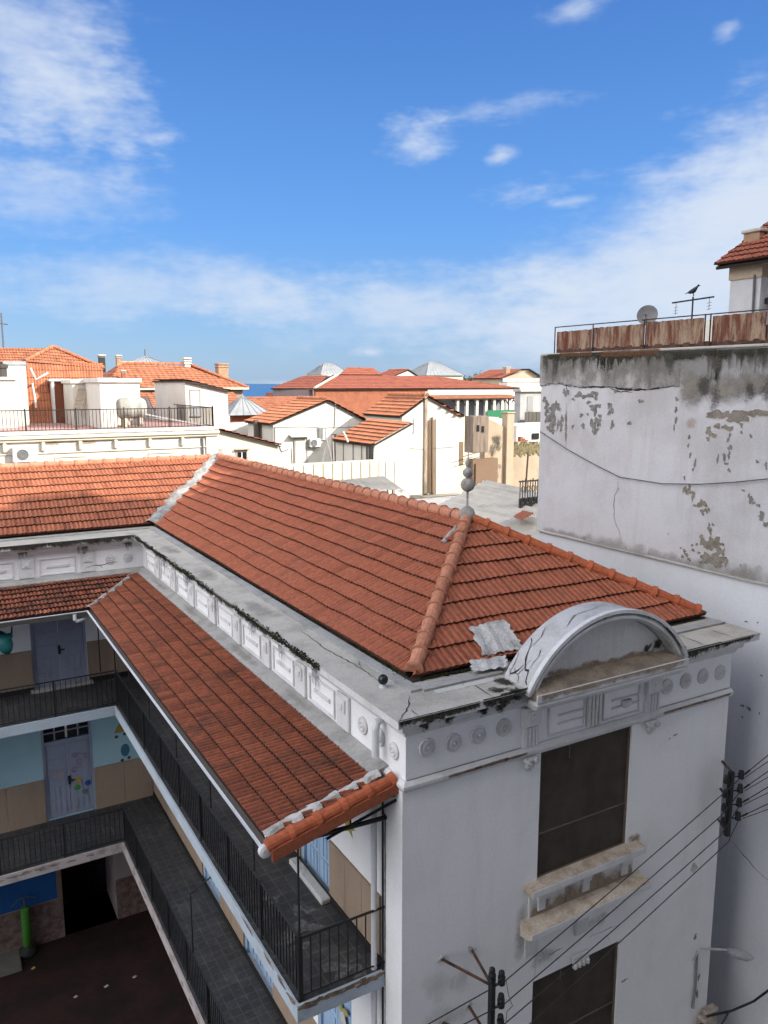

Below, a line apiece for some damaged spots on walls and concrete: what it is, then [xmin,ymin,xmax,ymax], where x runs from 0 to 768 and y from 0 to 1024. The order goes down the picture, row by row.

leakage [543,348,768,408]
peeling [542,388,632,441]
peeling [704,408,768,472]
peeling [680,435,741,570]
peeling [741,489,768,528]
crack [510,606,598,685]
leakage [399,677,528,730]
leakage [531,866,632,917]